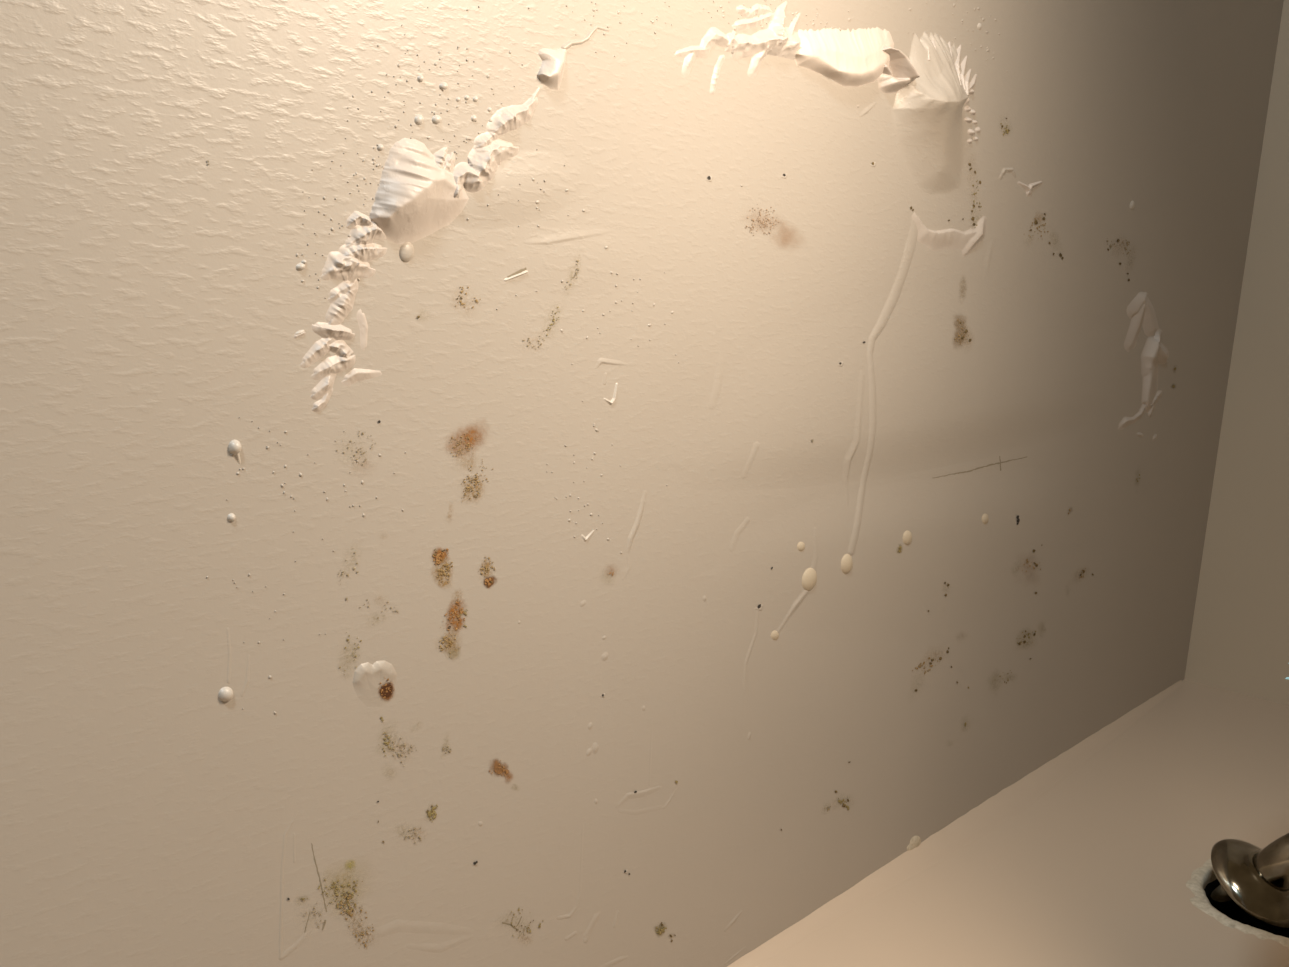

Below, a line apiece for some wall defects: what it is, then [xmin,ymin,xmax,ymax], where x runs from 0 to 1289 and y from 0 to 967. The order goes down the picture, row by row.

peeling [910,206,987,257]
spalling [504,267,528,281]
peeling [1118,291,1169,441]
corrosion [451,430,493,502]
corrosion [433,548,453,586]
corrosion [478,557,495,588]
corrosion [439,601,468,654]
corrosion [378,677,395,699]
corrosion [489,760,511,779]
water stain [300,863,374,949]